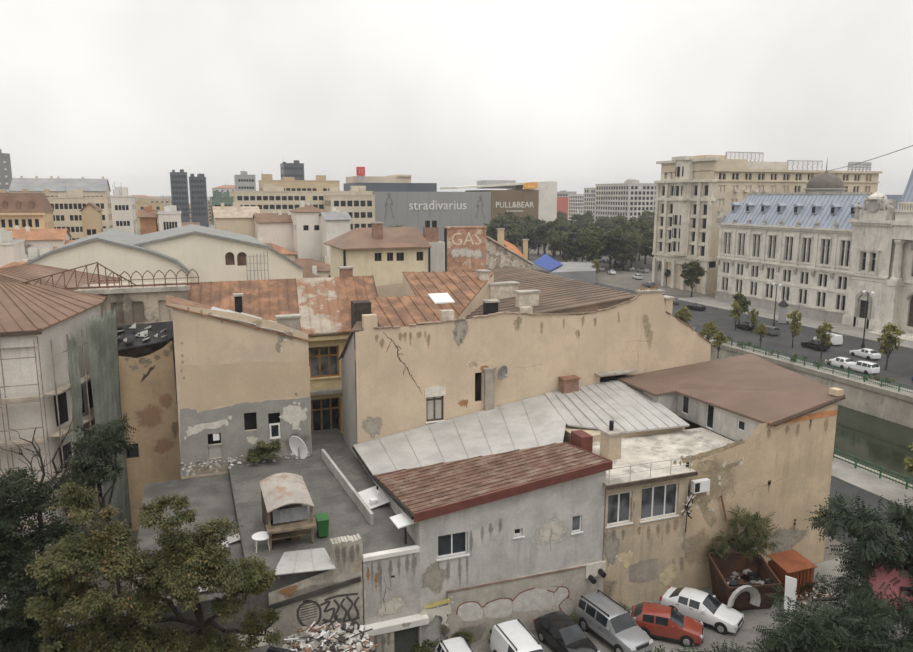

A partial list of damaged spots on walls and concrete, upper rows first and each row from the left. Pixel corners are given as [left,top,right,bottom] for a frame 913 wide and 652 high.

crack [383,332,421,392]
spalling [184,415,232,440]
spalling [279,401,308,431]